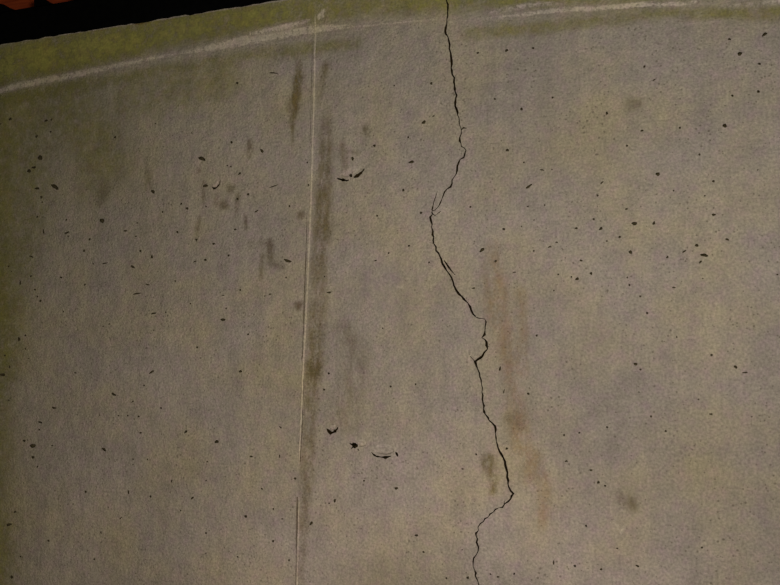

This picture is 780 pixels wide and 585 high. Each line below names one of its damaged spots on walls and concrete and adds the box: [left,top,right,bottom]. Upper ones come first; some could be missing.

crack [429,0,515,585]